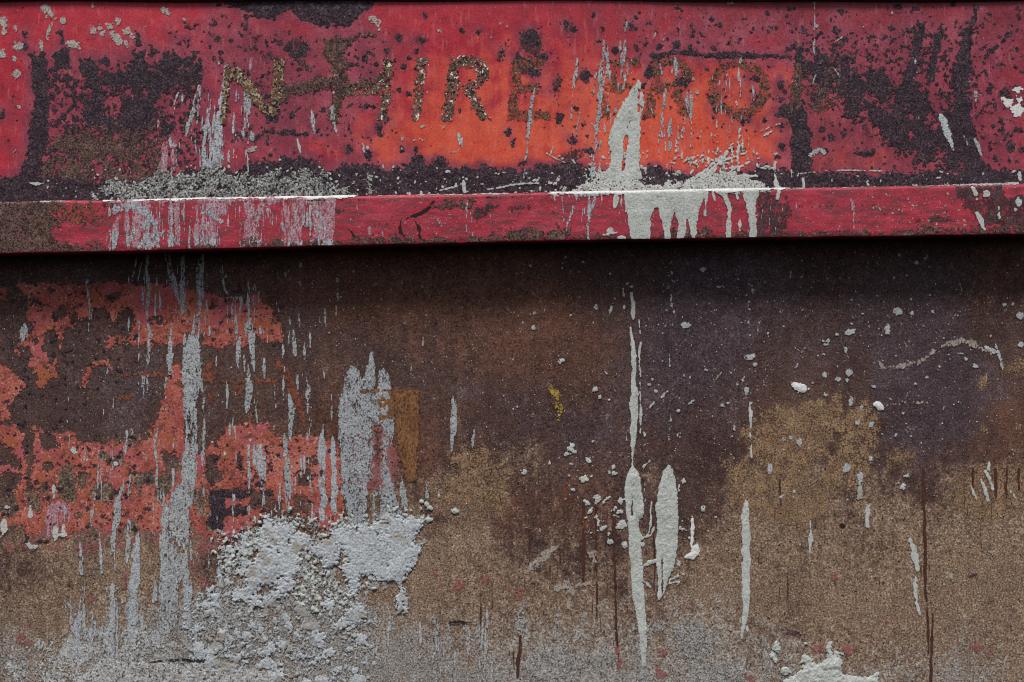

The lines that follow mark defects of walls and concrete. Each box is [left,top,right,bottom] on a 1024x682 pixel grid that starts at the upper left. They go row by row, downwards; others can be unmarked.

peeling [0,16,24,80]
peeling [38,3,66,51]
peeling [90,17,135,48]
peeling [0,280,401,541]
rust [431,443,511,520]
rust [564,483,601,624]
rust [613,510,621,663]
rust [719,391,934,682]
rust [942,456,1024,548]
rust [513,635,522,678]